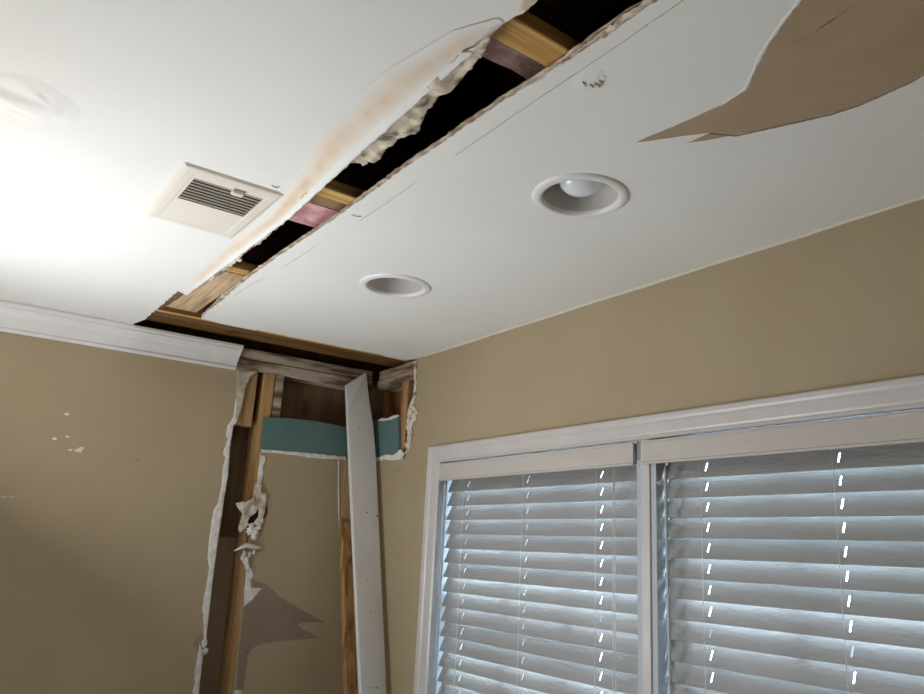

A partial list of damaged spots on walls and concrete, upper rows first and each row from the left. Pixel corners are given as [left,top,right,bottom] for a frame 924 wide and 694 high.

peeling [561,0,658,64]
peeling [637,0,924,143]
water stain [174,18,504,294]
peeling [237,579,323,690]